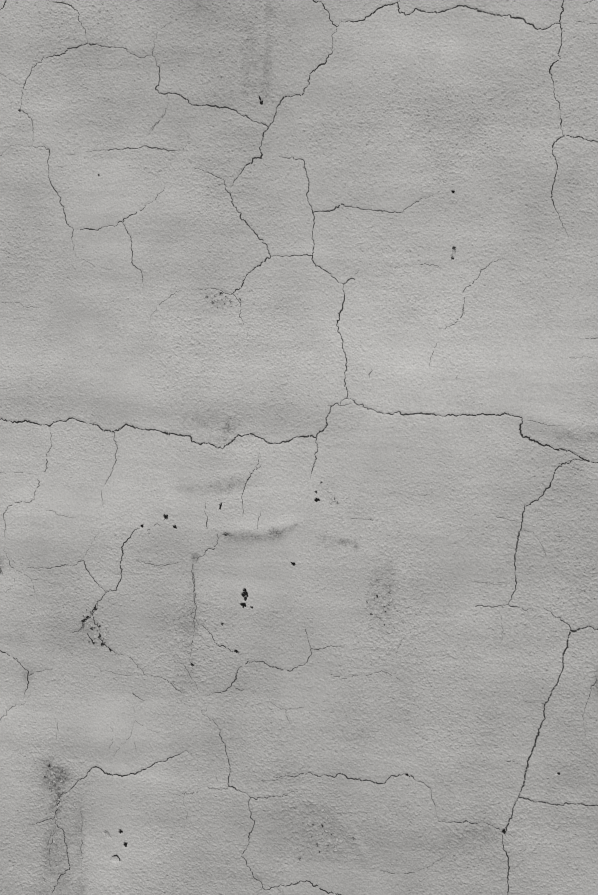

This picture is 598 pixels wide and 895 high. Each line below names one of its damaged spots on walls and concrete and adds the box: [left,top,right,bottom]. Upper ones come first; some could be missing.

crack [0,0,598,637]
crack [0,506,598,895]